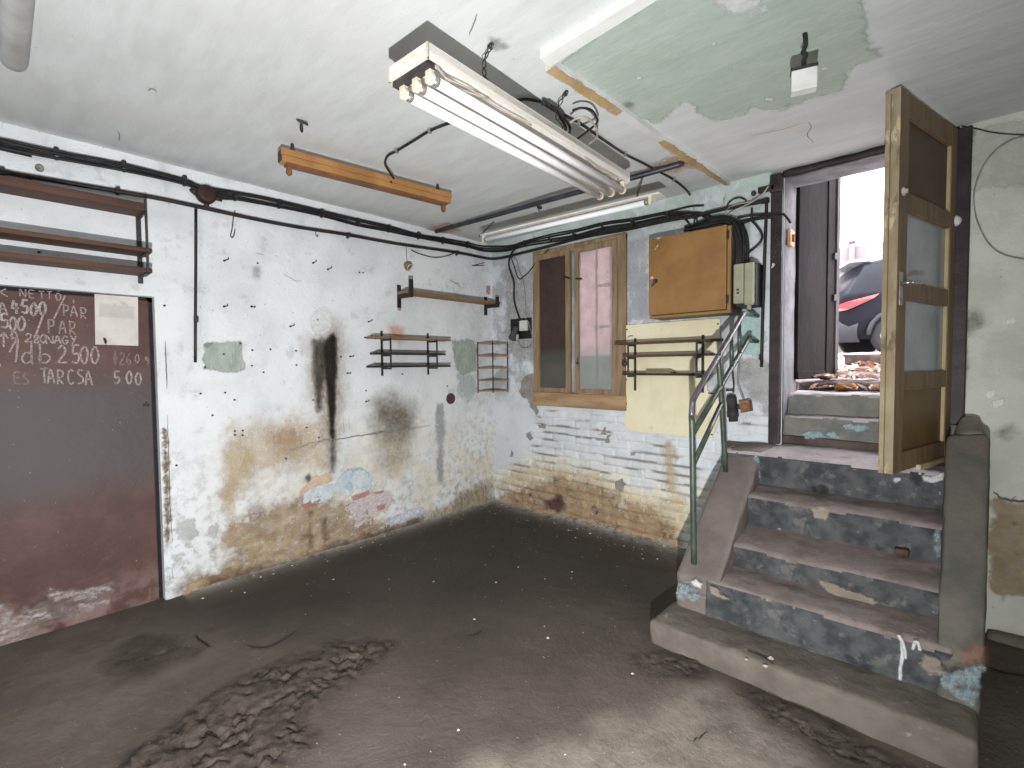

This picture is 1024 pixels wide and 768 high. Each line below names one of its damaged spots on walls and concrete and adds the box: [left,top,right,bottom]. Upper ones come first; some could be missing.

peeling [547,0,878,124]
damp [378,401,410,461]
damp [226,421,335,510]
peeling [300,468,425,530]
damp [180,443,684,589]
spalling [811,507,829,520]
flaking render [988,498,1024,595]
peeling [676,580,728,601]
spalling [819,580,878,605]
peeling [921,654,985,705]